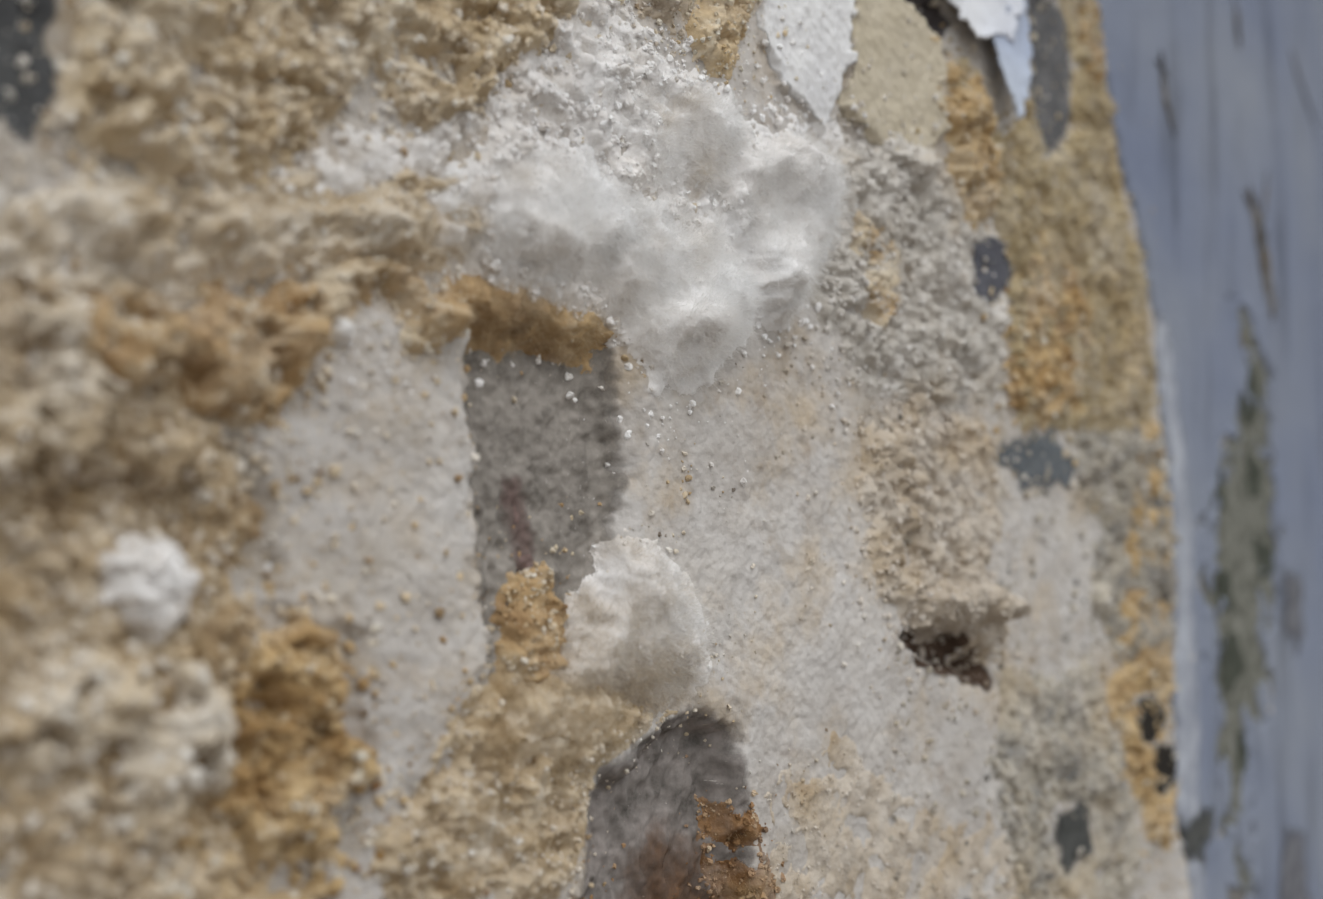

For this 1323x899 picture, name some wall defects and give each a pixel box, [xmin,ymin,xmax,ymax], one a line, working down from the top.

peeling [947,0,1033,121]
hole [898,630,992,691]
spalling [580,711,753,899]